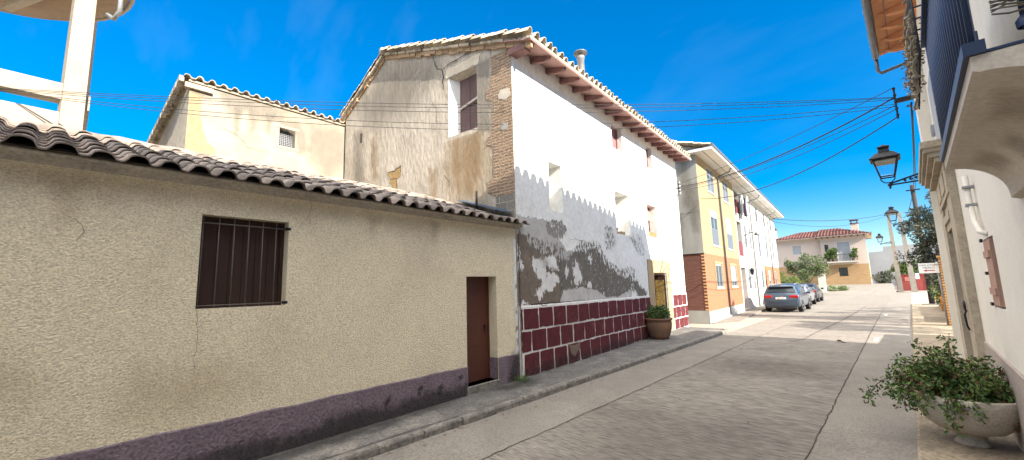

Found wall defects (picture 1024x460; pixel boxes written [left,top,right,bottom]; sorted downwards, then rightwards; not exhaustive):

crack [427,49,507,123]
spalling [387,165,401,189]
peeling [513,219,647,354]